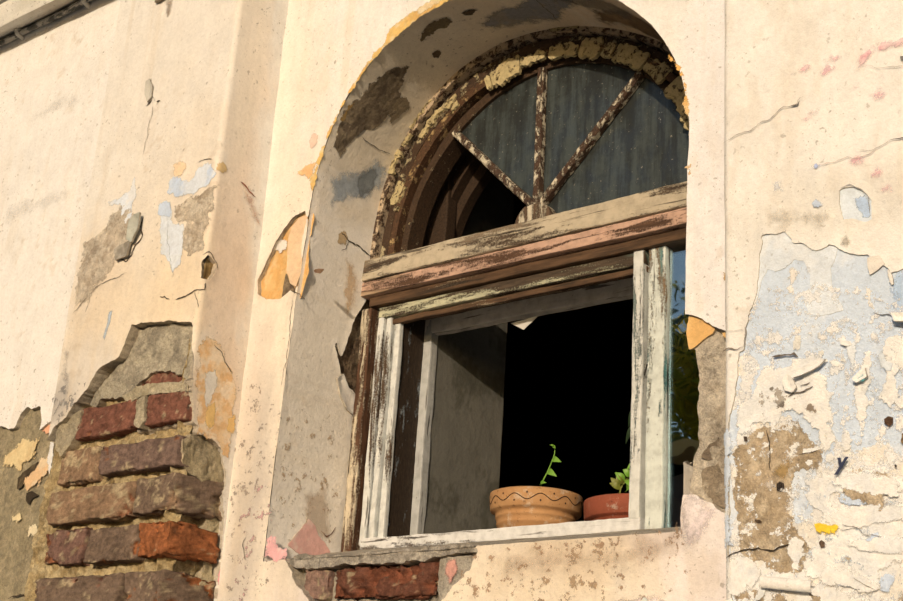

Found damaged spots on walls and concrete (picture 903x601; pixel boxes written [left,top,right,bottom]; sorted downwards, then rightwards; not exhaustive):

damp [485,0,666,45]
flaking render [298,0,460,211]
crack [729,96,803,140]
crack [819,137,903,165]
flaking render [75,177,143,305]
flaking render [158,158,227,279]
flaking render [261,210,324,299]
flaking render [0,323,237,601]
peeling [686,232,903,601]
peeling [264,519,478,601]